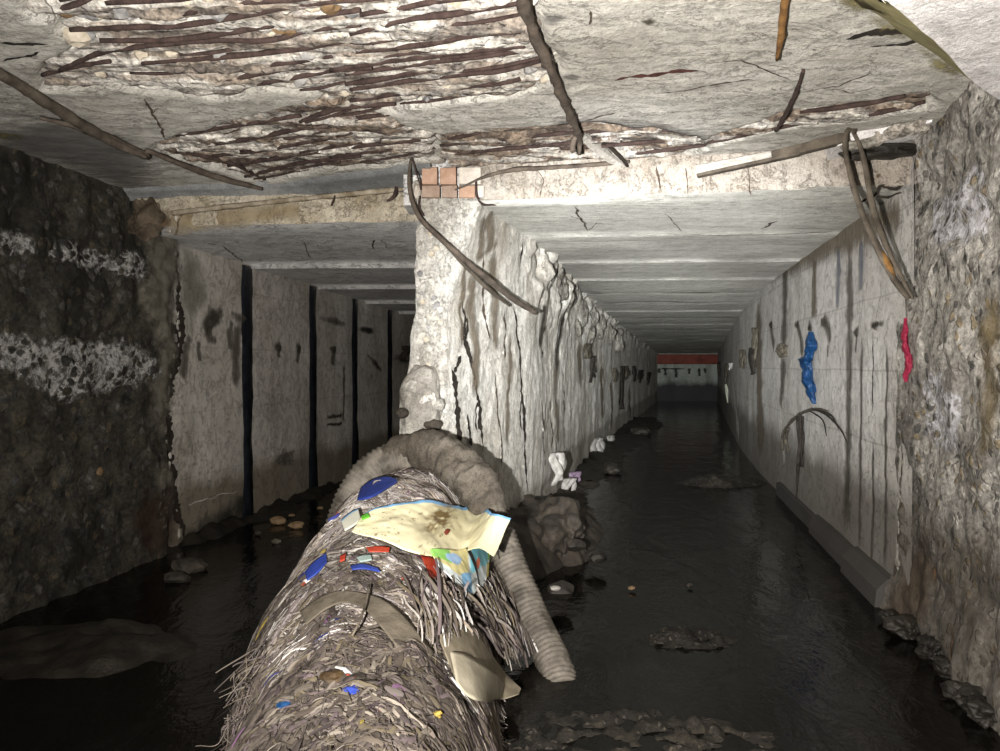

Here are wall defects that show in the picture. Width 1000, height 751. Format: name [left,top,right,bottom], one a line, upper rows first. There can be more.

crack [144,99,170,140]
spalling [25,0,930,386]
water stain [0,332,162,400]
crack [165,216,186,540]
water stain [181,309,246,384]
water stain [327,346,345,426]
crack [451,255,565,492]
water stain [756,205,931,618]